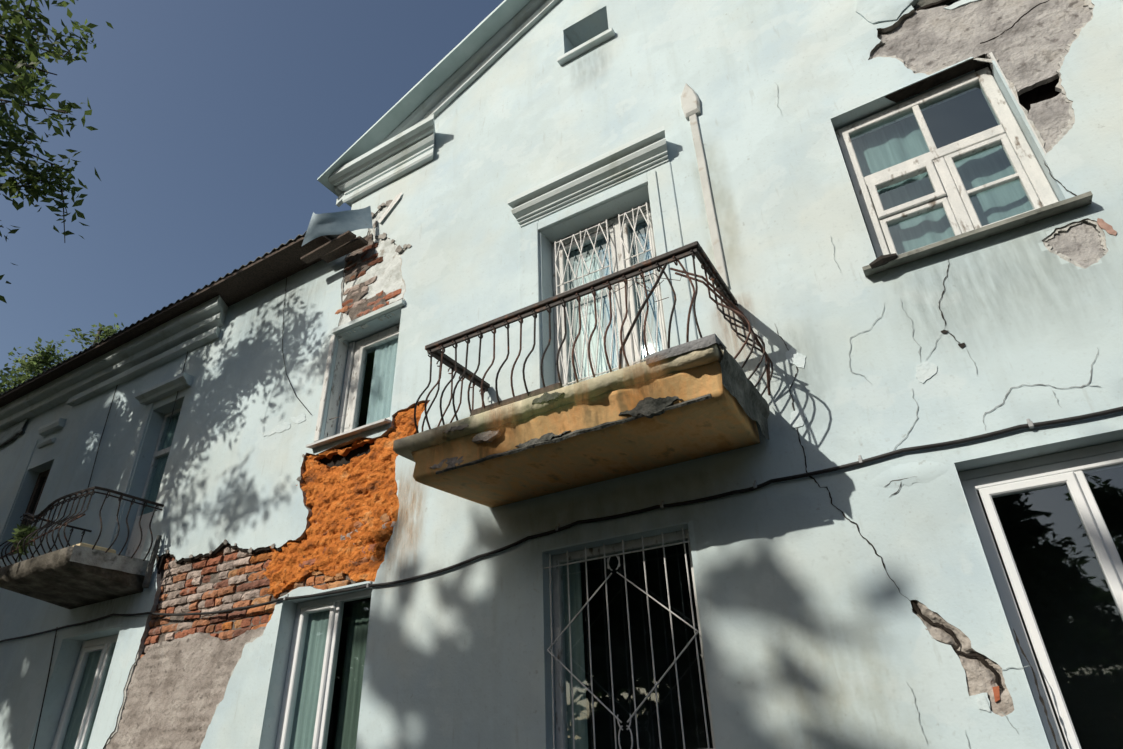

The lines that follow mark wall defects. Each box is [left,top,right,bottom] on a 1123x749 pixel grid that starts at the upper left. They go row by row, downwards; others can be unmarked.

flaking render [869,0,1094,155]
flaking render [335,192,412,342]
crack [849,259,977,383]
flaking render [1042,218,1117,269]
spalling [430,392,712,475]
spalling [646,333,770,440]
crack [776,327,910,601]
crack [893,389,919,451]
crack [983,348,1100,430]
flaking render [70,402,429,749]
flaking render [911,601,1014,717]